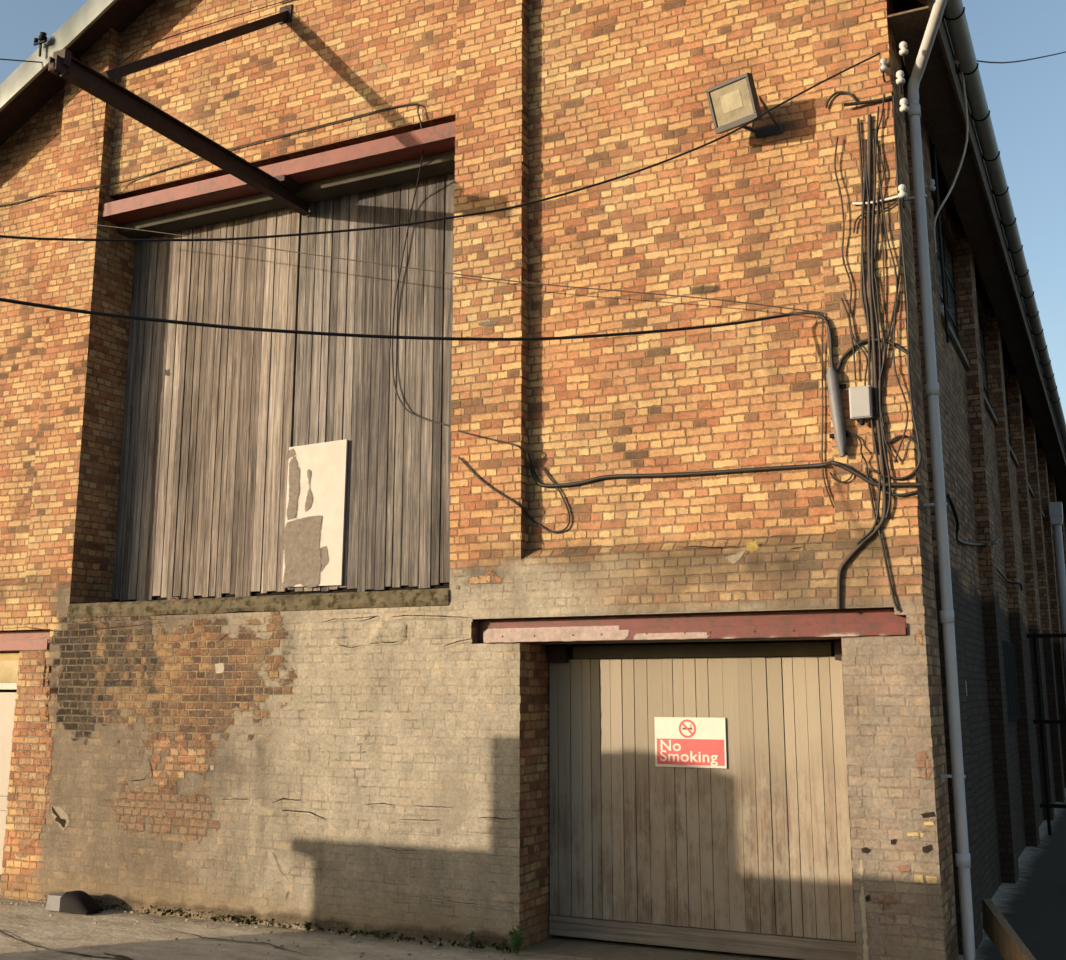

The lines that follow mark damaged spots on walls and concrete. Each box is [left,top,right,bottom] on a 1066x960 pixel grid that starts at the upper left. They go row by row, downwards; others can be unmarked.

peeling [12,610,297,858]